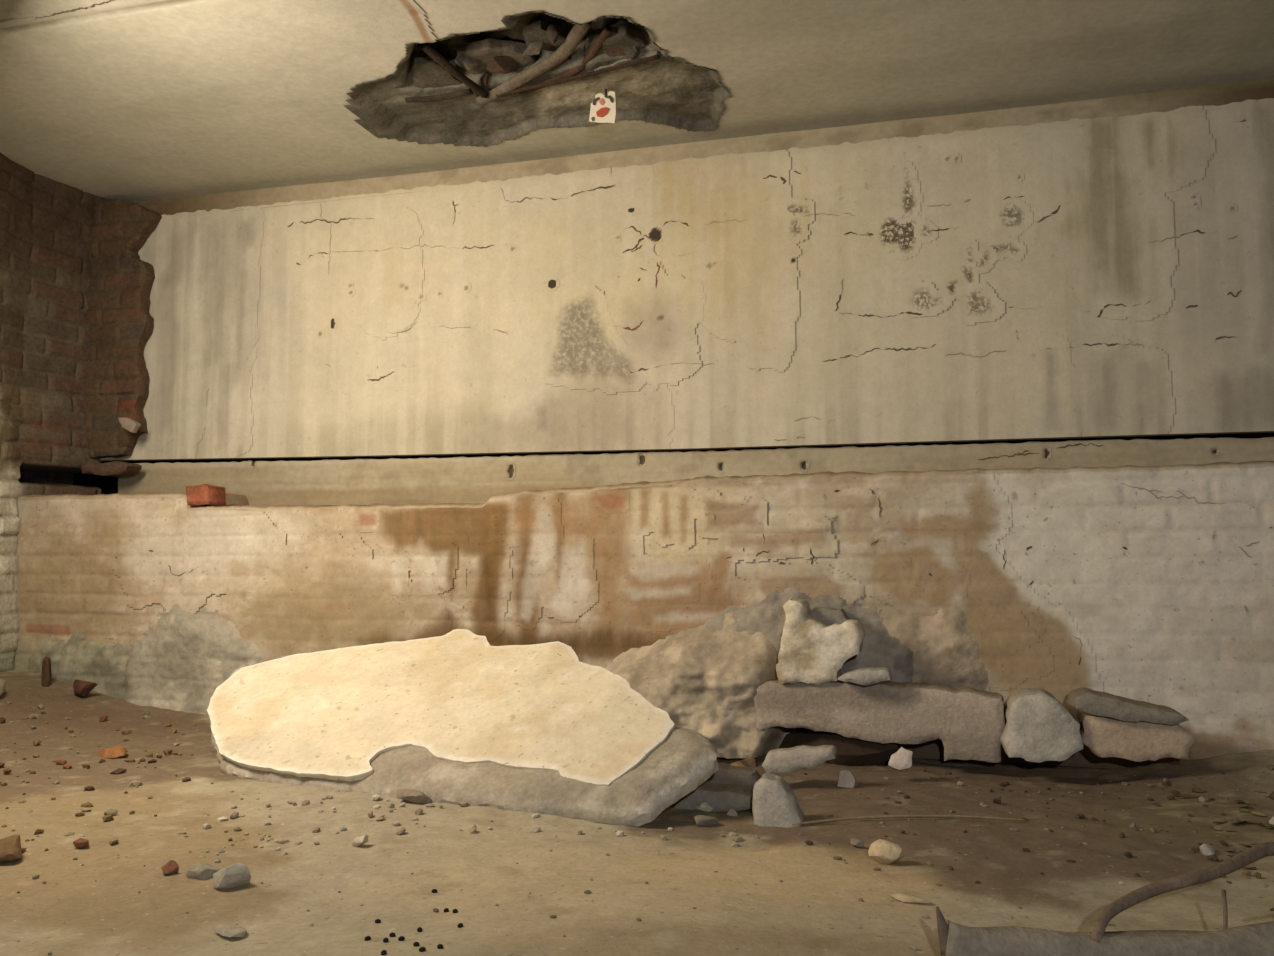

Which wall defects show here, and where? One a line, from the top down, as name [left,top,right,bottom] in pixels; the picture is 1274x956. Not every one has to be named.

rust [392,0,438,43]
spalling [344,10,732,147]
crack [287,201,492,271]
crack [501,167,614,203]
water stain [475,150,814,453]
crack [622,219,743,286]
crack [835,280,923,318]
water stain [871,161,938,261]
crack [823,301,1150,362]
water stain [903,106,1215,325]
water stain [1025,98,1274,438]
water stain [512,496,599,630]